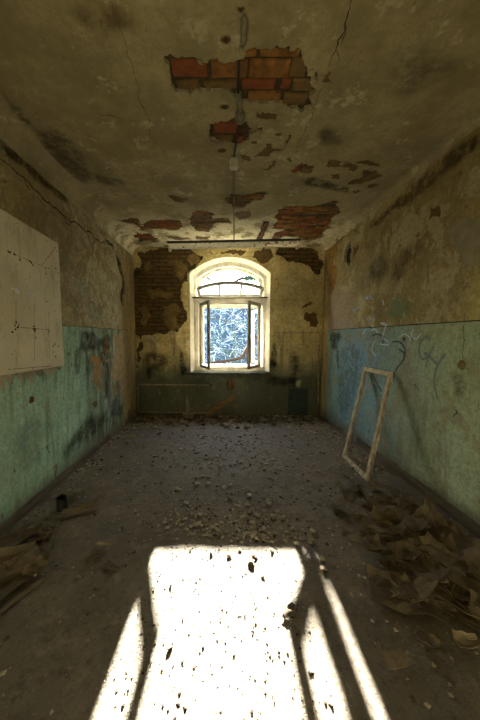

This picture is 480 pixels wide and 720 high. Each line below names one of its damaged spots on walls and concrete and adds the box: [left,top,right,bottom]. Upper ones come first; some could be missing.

crack [329,0,352,66]
flaking render [164,39,383,194]
crack [0,158,114,250]
flaking render [89,190,359,410]